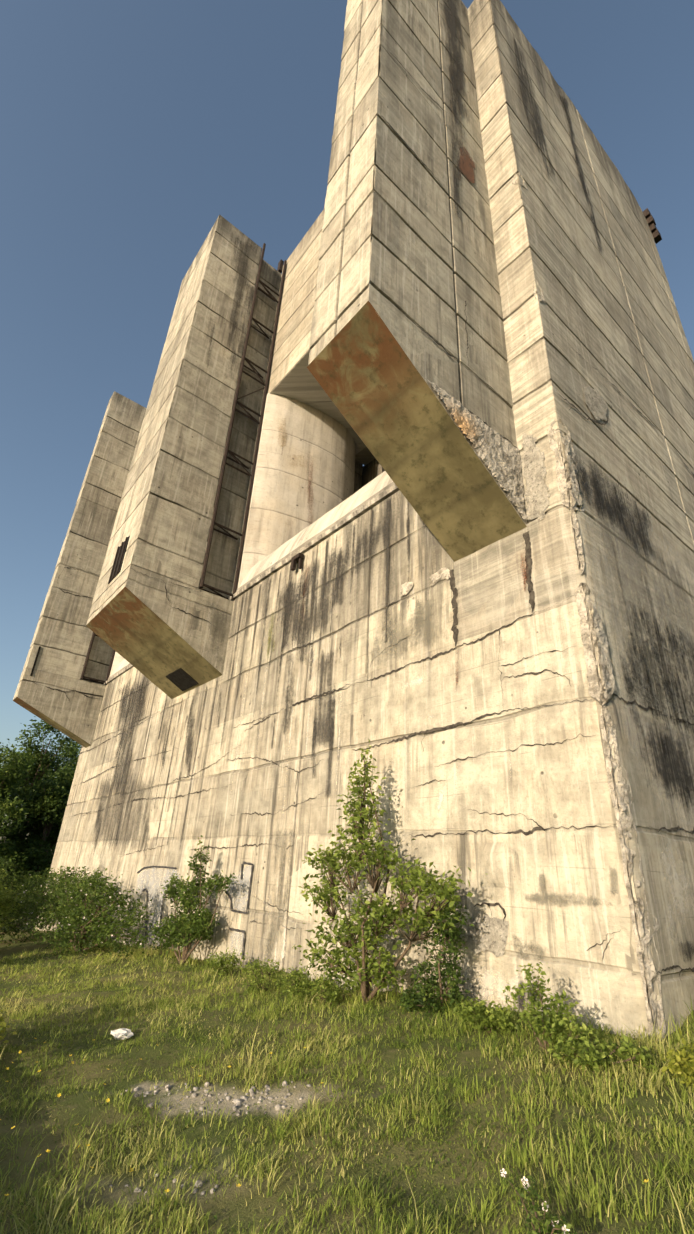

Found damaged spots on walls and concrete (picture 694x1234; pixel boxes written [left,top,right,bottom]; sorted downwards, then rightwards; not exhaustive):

damp [444,0,467,215]
corrosion [458,147,475,183]
damp [513,37,554,174]
damp [560,96,602,250]
damp [574,459,664,564]
crack [33,682,97,699]
damp [101,499,390,844]
crack [74,595,694,856]
spalling [427,379,666,1038]
damp [622,604,694,807]
crack [474,902,506,922]
crack [656,965,694,982]